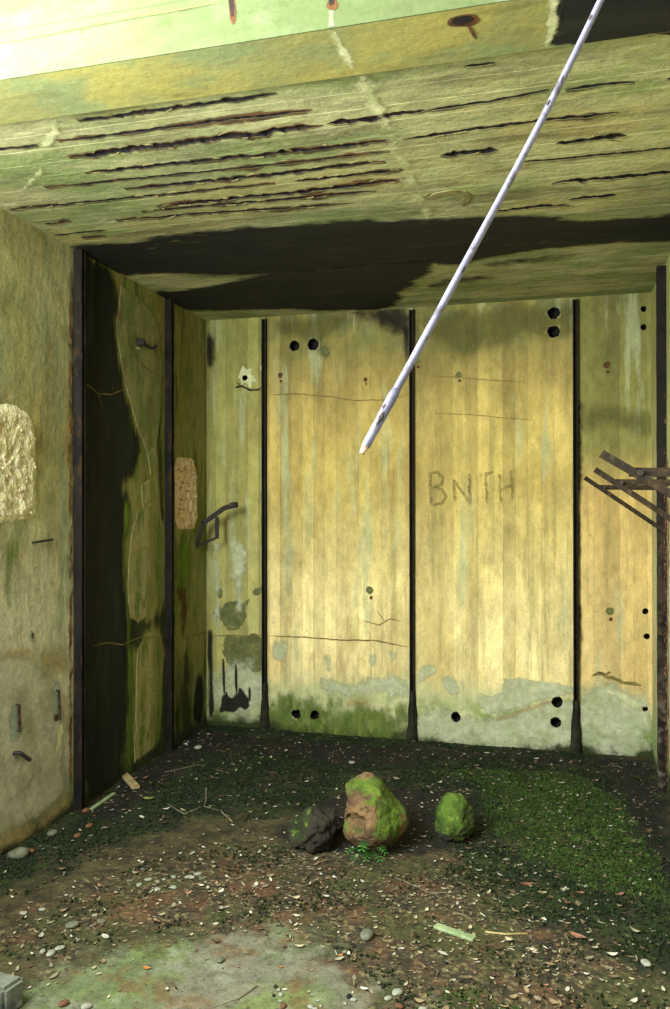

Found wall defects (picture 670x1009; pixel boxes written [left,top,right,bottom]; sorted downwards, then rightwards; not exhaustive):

rust [228,0,236,24]
damp [329,10,353,66]
rust [448,14,479,39]
damp [546,0,670,47]
damp [42,122,61,147]
spalling [0,403,37,523]
damp [71,76,670,799]
spalling [174,457,198,529]